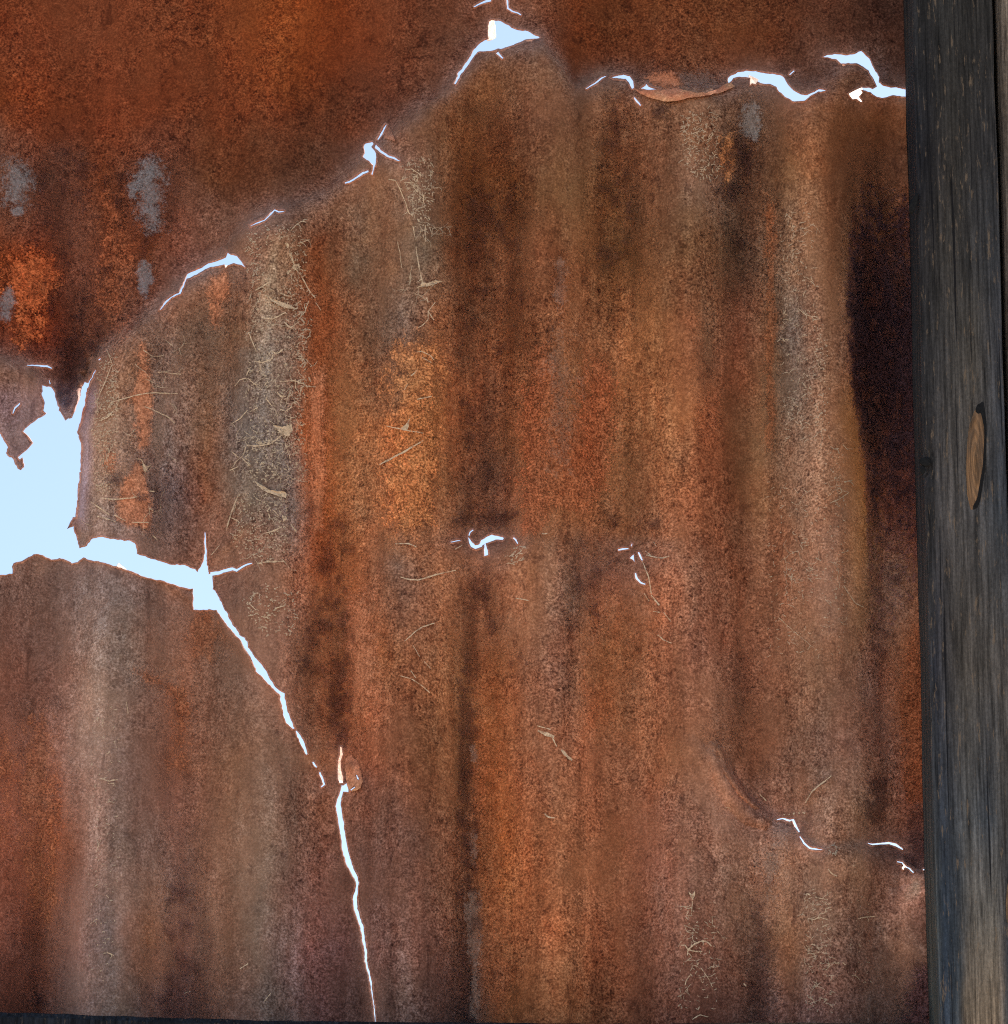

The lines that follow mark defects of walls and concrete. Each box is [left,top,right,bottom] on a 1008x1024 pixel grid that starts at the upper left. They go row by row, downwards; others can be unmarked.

crack [452,0,542,86]
crack [584,49,906,107]
crack [343,122,401,185]
corrosion [0,244,63,351]
corrosion [300,296,344,575]
corrosion [376,338,449,528]
corrosion [514,345,617,535]
crack [449,527,548,558]
crack [0,356,377,1022]
corrosion [339,592,379,718]
corrosion [898,628,923,803]
crack [760,795,924,920]